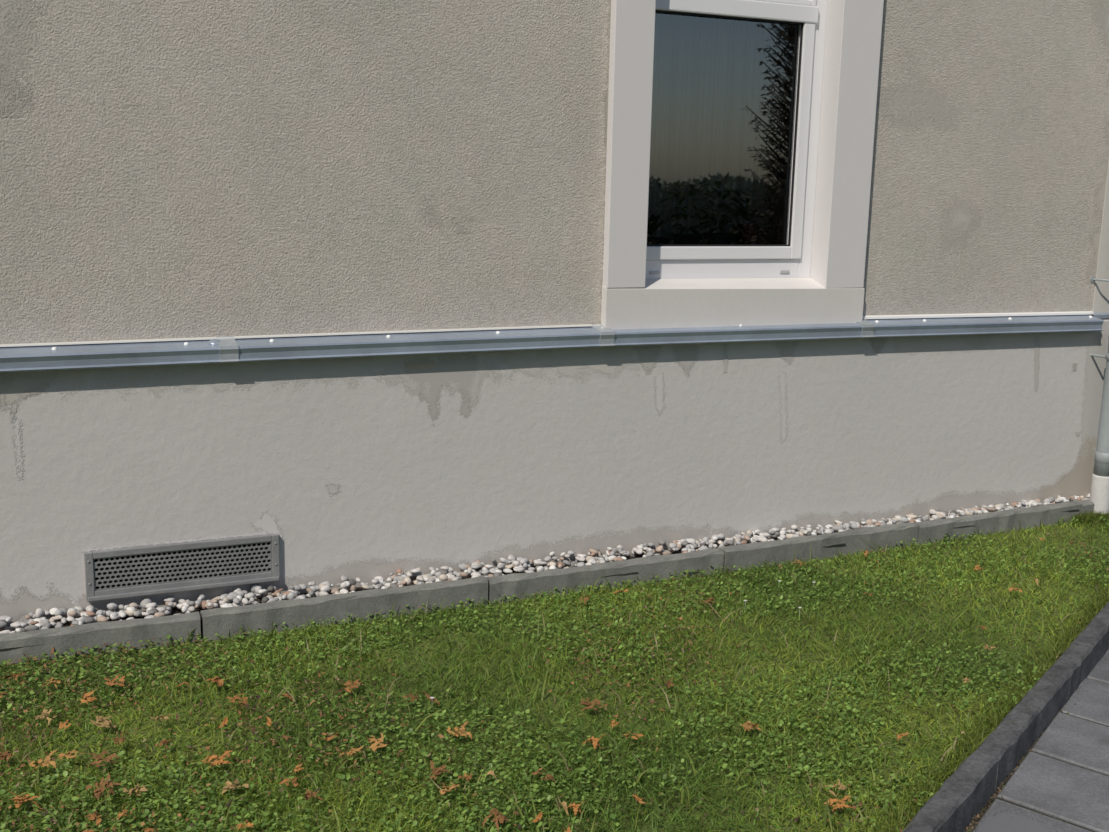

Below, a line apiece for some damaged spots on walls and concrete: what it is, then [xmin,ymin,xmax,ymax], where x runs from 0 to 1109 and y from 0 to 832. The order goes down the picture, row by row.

damp [0,331,1108,625]